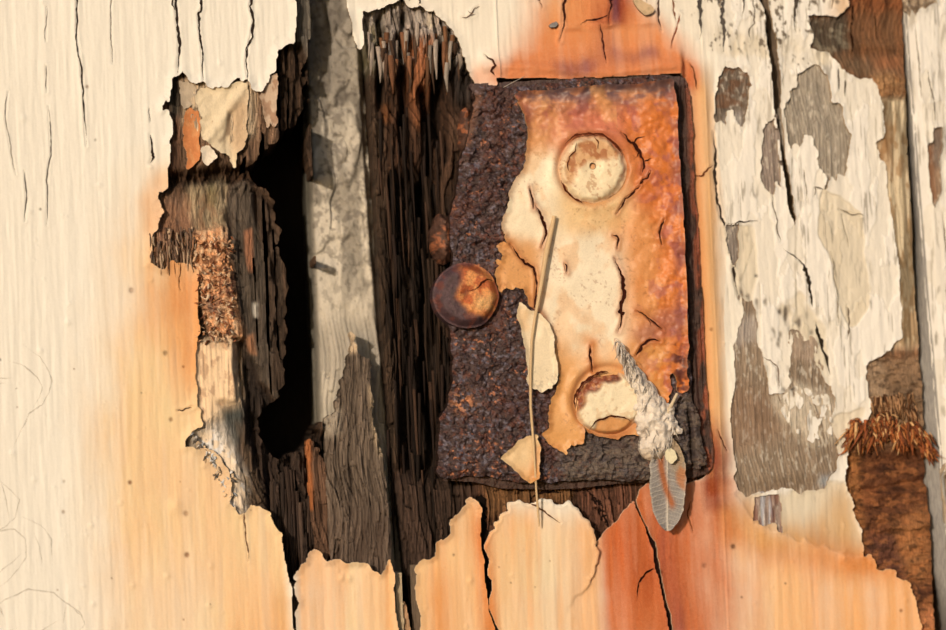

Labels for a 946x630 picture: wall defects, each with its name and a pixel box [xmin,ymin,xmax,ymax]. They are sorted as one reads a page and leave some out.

crack [75,0,87,142]
crack [171,0,204,81]
crack [245,0,255,78]
crack [646,0,770,57]
peeling [714,67,751,126]
spalling [179,73,311,458]
corrosion [468,74,717,478]
peeling [726,225,738,265]
peeling [730,0,946,630]
peeling [190,433,238,509]
corrosion [442,475,650,490]
crack [636,508,671,630]